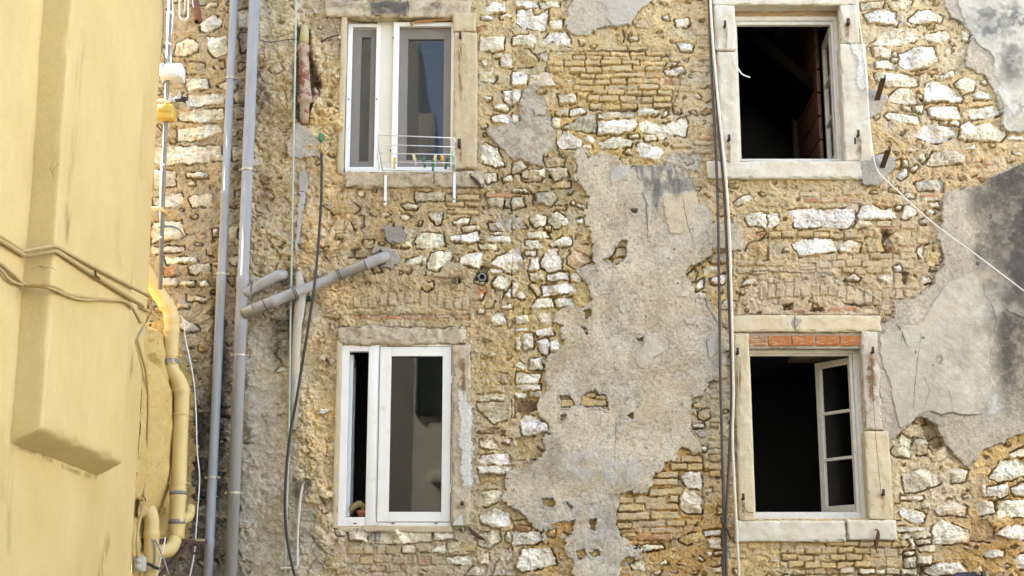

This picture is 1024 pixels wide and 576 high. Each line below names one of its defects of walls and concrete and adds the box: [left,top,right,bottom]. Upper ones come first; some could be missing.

peeling [565,0,651,37]
peeling [943,0,1024,135]
leakage [635,165,697,203]
peeling [501,148,1024,576]
rust [867,358,876,401]
crack [896,323,984,419]